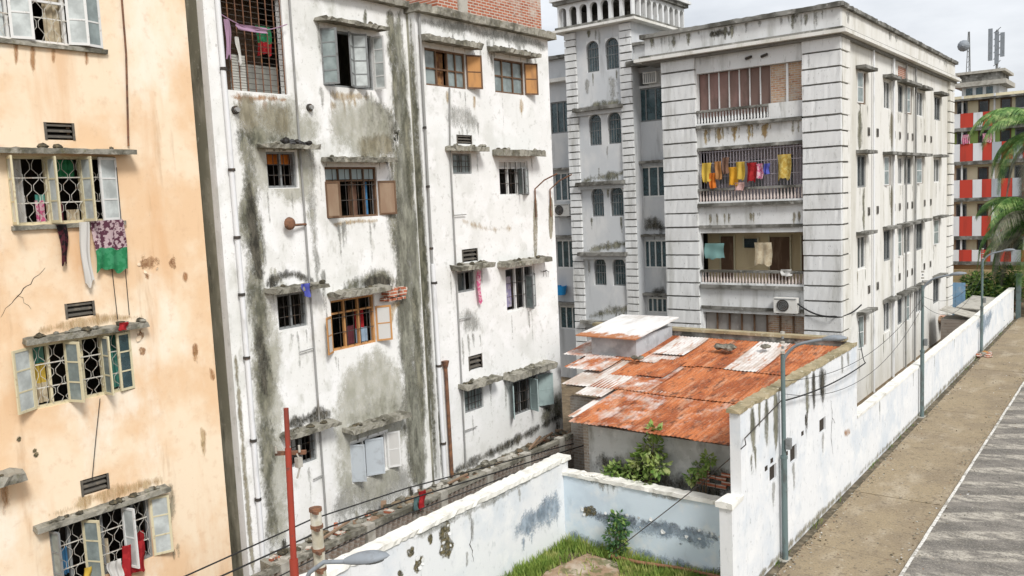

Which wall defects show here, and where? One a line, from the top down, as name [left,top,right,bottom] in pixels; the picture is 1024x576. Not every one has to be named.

leakage [331,11,401,169]
leakage [236,96,325,296]
leakage [256,269,422,547]
leakage [750,394,778,464]
leakage [805,369,826,431]
peeling [428,520,454,559]
leakage [516,492,559,545]